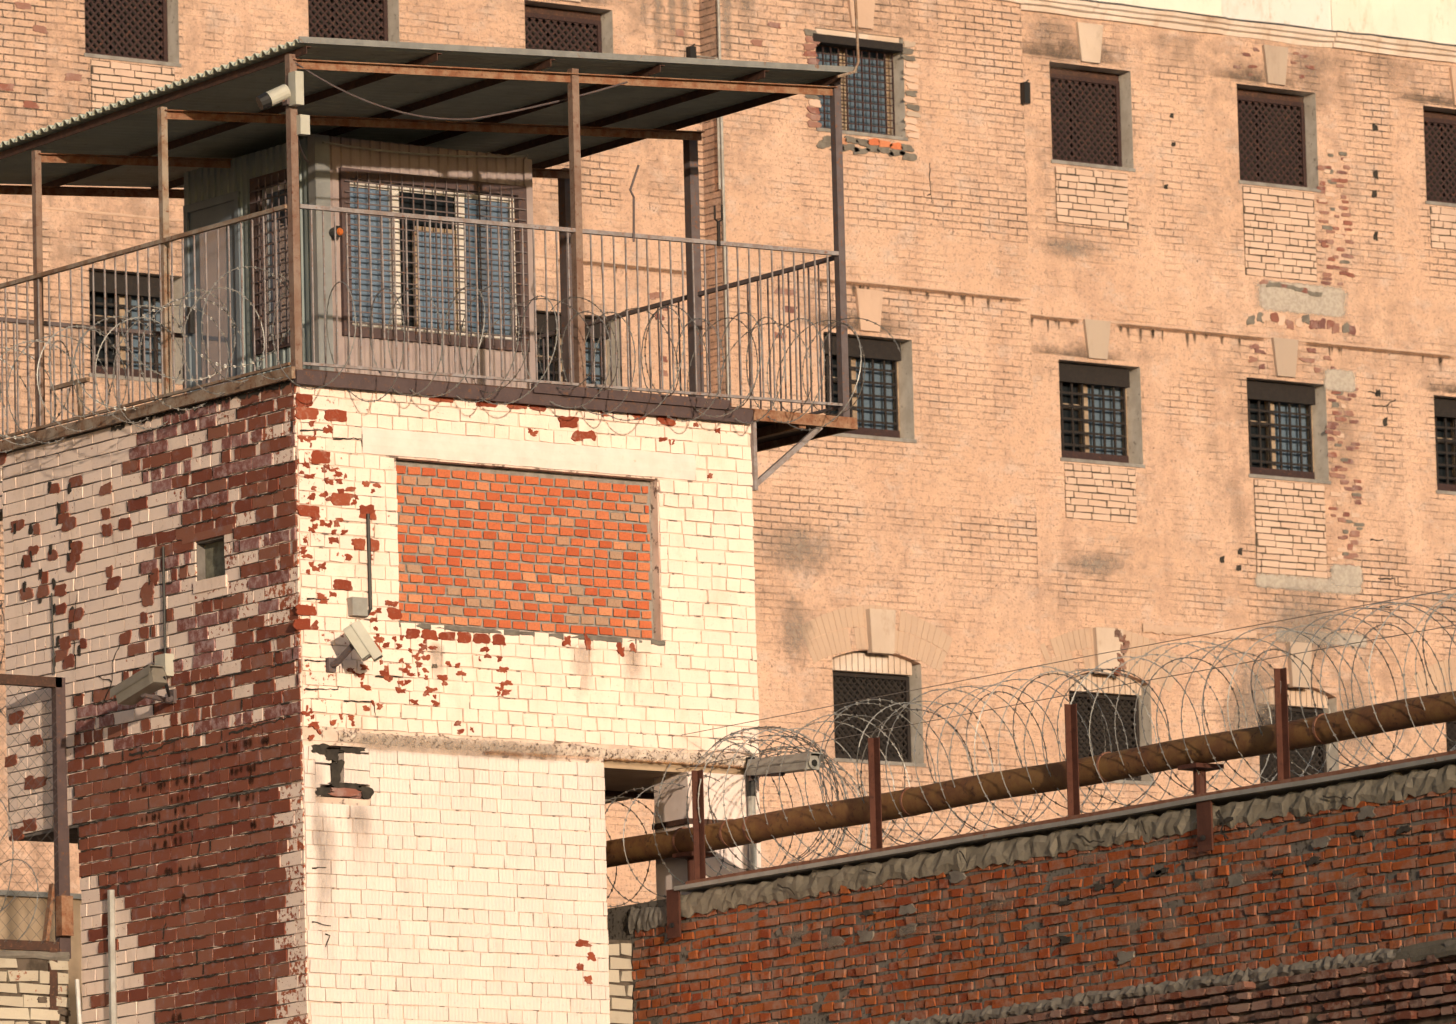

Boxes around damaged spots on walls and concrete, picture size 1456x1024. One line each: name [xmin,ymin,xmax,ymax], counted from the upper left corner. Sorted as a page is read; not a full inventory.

spalling [802,28,820,65]
spalling [805,41,921,161]
flaking render [1242,149,1355,297]
flaking render [1248,343,1266,369]
flaking render [1246,312,1356,335]
flaking render [1219,348,1381,587]
spalling [1113,628,1130,676]
peeling [10,380,513,1024]
peeling [4,710,47,790]